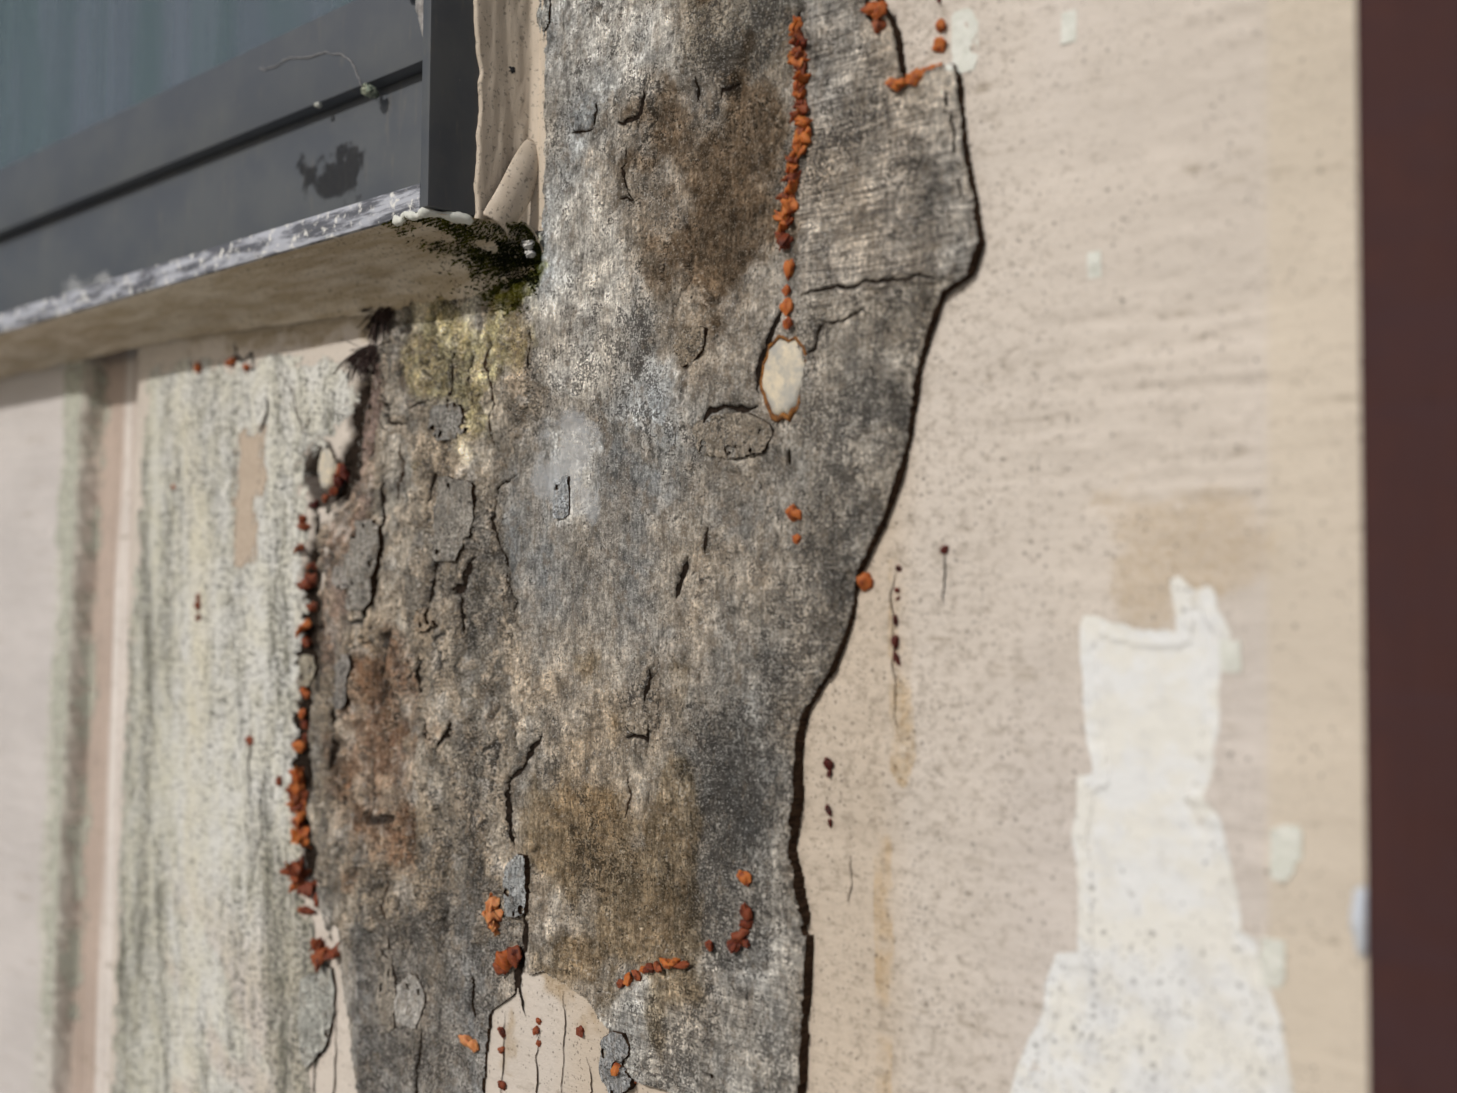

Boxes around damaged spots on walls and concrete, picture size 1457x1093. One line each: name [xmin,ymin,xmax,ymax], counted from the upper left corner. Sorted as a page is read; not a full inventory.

water stain [333,306,400,389]
crack [703,273,943,421]
crack [429,476,518,633]
crack [676,528,709,598]
crack [248,341,495,908]
crack [627,668,652,743]
crack [504,735,543,842]
peeling [1011,577,1293,1093]
peeling [1270,824,1303,882]
crack [313,1005,339,1093]
crack [415,1030,423,1093]
crack [471,914,592,1093]